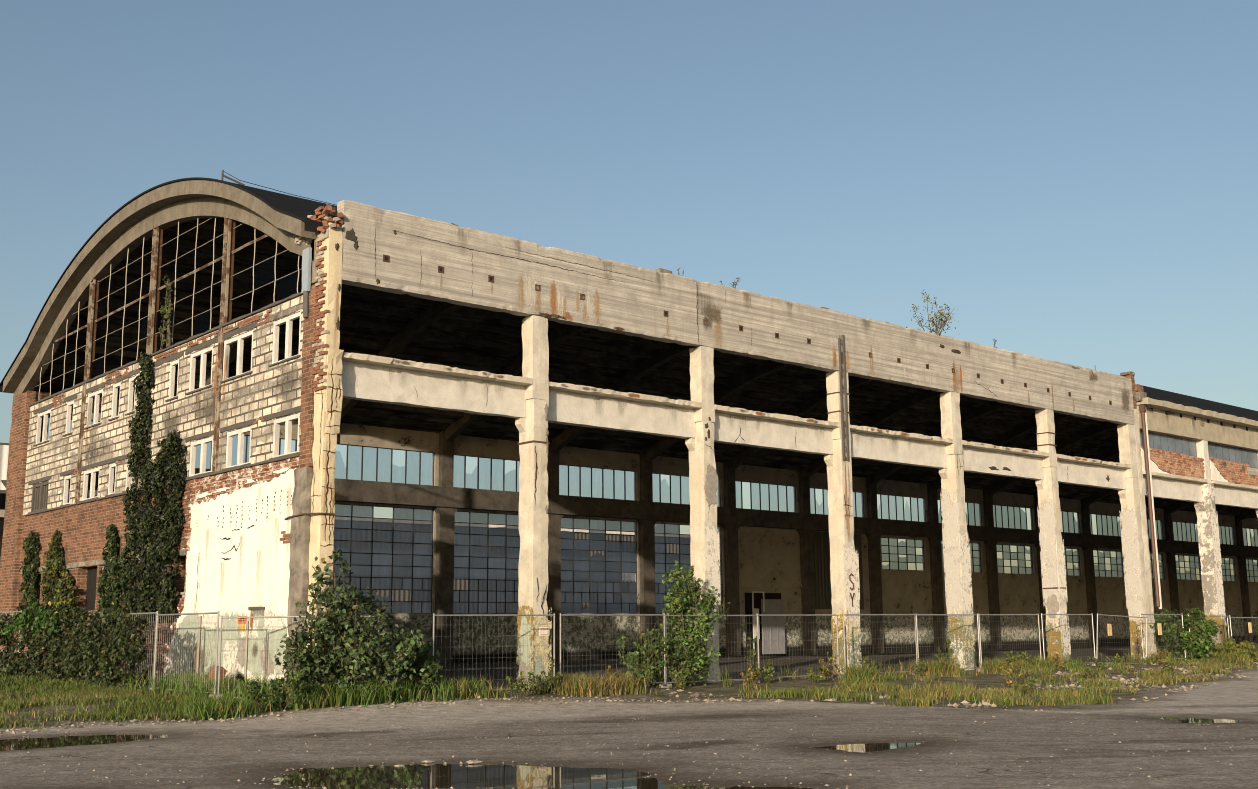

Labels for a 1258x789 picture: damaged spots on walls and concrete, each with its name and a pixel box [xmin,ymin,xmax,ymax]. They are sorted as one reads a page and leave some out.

rust [537,284,599,319]